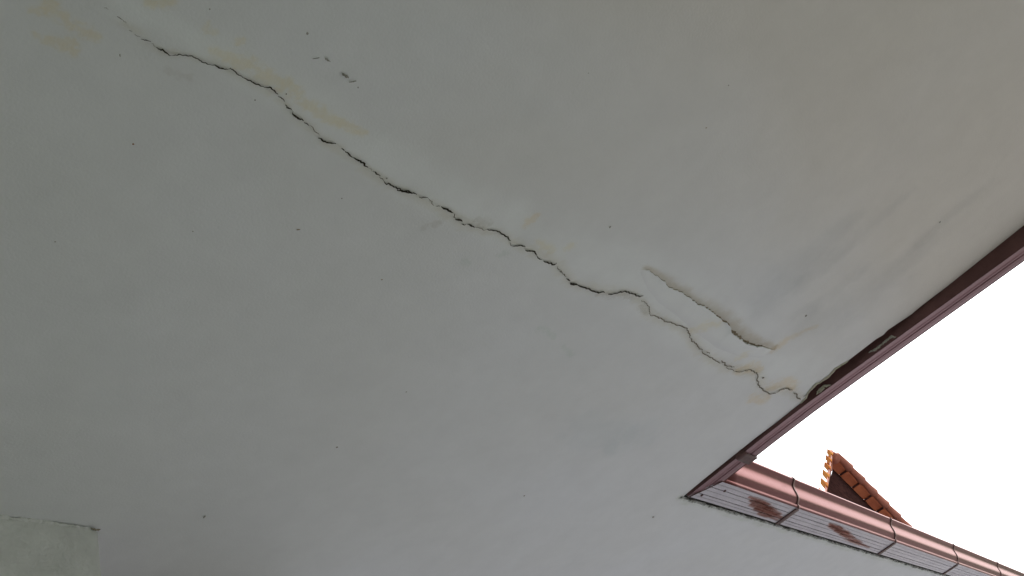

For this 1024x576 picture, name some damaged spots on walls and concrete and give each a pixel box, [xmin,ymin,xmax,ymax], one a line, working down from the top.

crack [117,16,801,400]